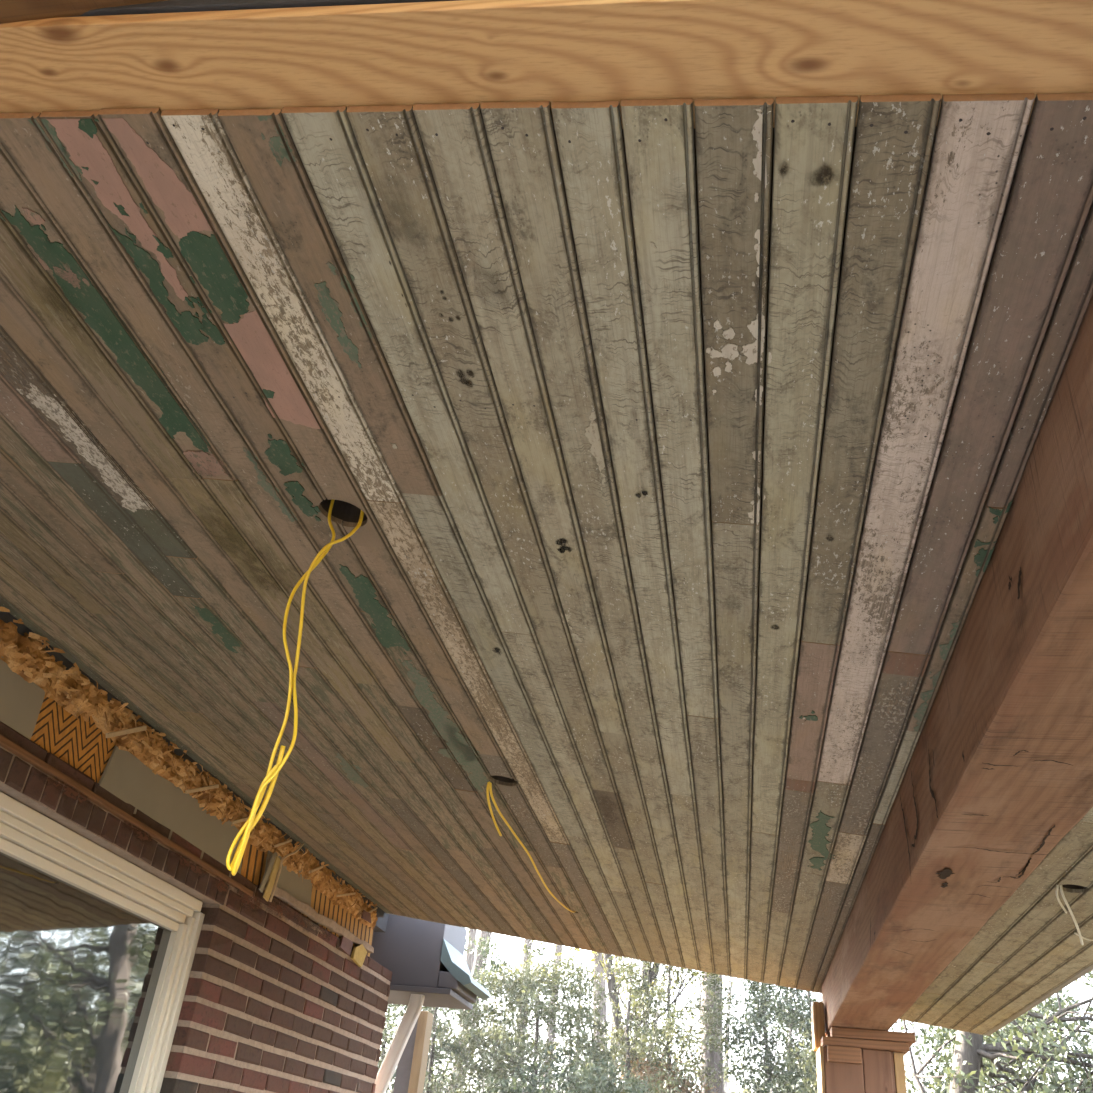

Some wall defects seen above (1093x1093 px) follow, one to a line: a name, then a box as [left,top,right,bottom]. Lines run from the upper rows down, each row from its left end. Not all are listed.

peeling [0,206,234,481]
peeling [28,116,323,429]
peeling [706,229,772,407]
peeling [17,383,154,512]
peeling [264,434,321,522]
peeling [748,475,765,533]
peeling [339,564,489,792]
peeling [808,811,835,871]